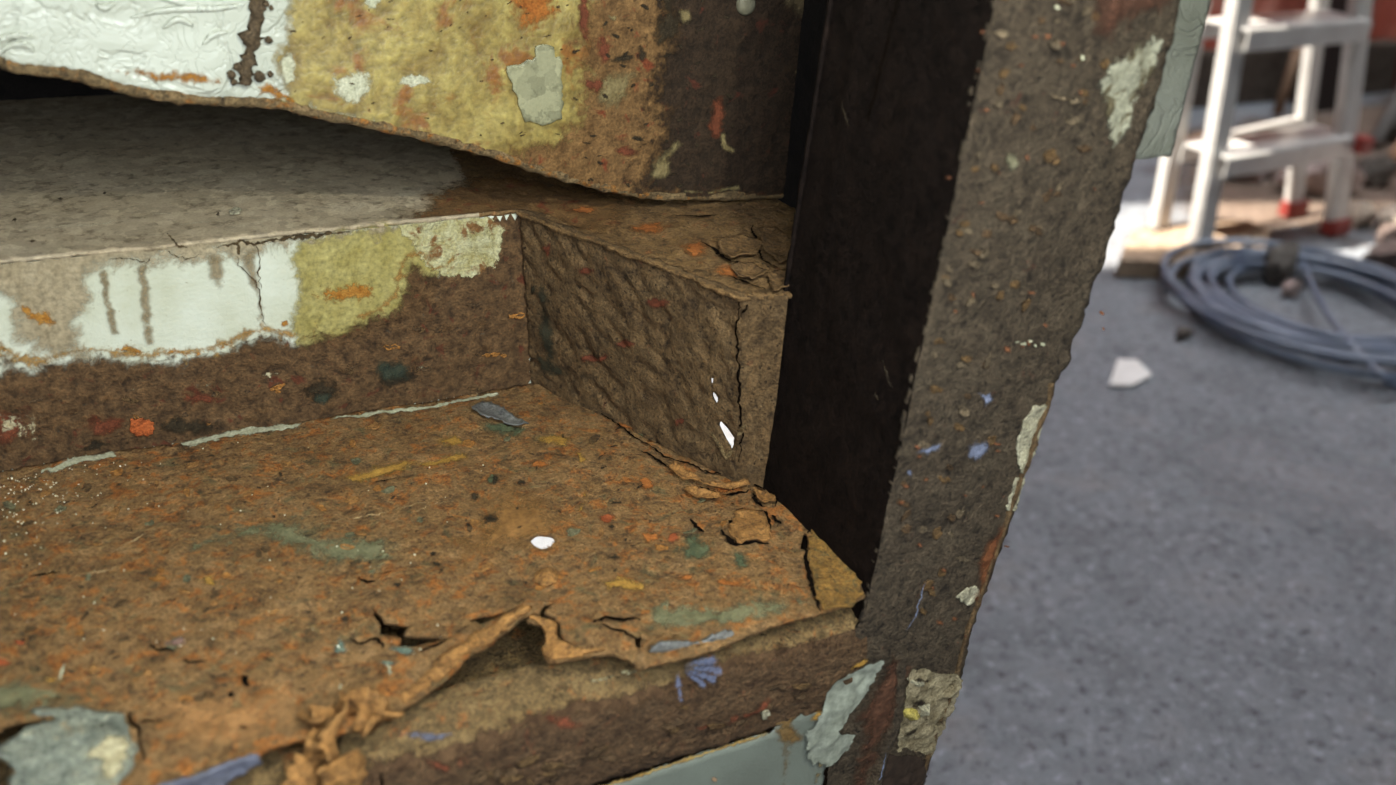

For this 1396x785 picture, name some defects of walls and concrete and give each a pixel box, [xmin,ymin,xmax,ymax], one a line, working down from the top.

spalling [0,68,126,100]
peeling [506,44,564,126]
peeling [1101,36,1163,148]
peeling [652,144,677,177]
rust [0,0,802,505]
peeling [398,216,505,278]
spalling [466,493,497,526]
rust [669,461,776,544]
rust [588,566,644,591]
peeling [410,732,451,741]